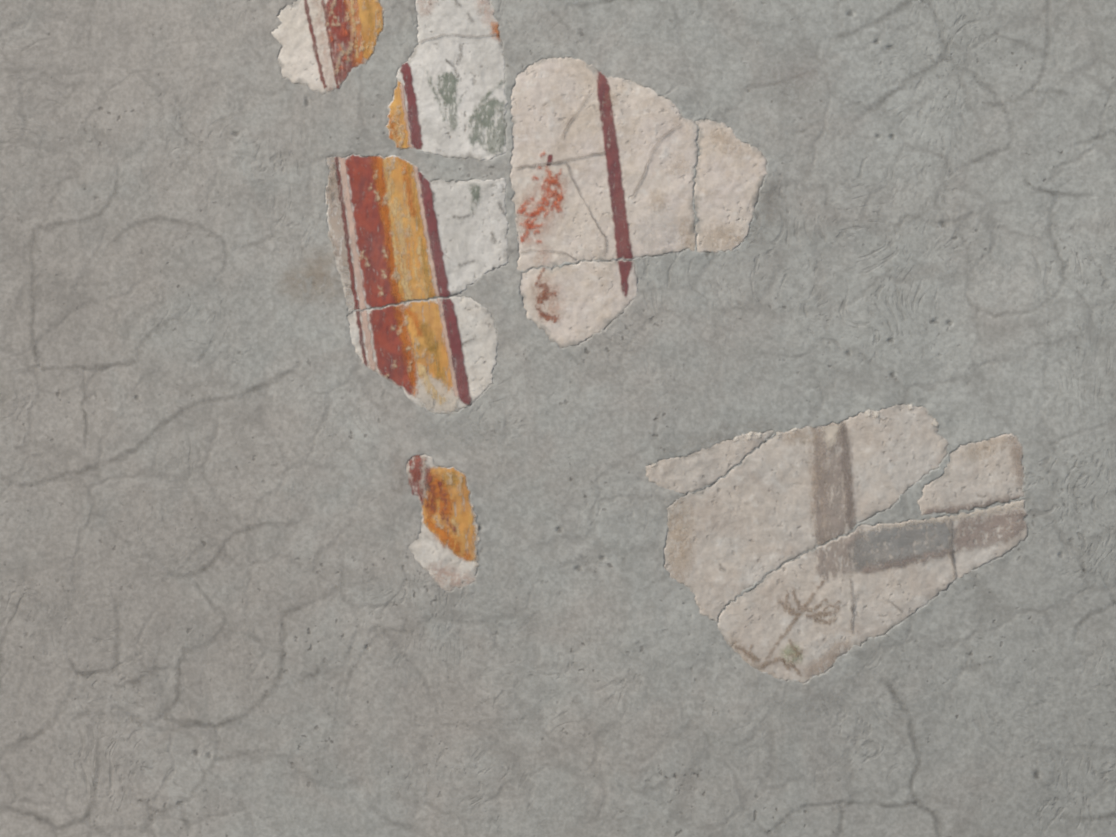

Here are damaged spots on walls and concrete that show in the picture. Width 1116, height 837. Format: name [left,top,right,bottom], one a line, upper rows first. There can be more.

crack [520,152,604,167]
crack [948,549,956,576]